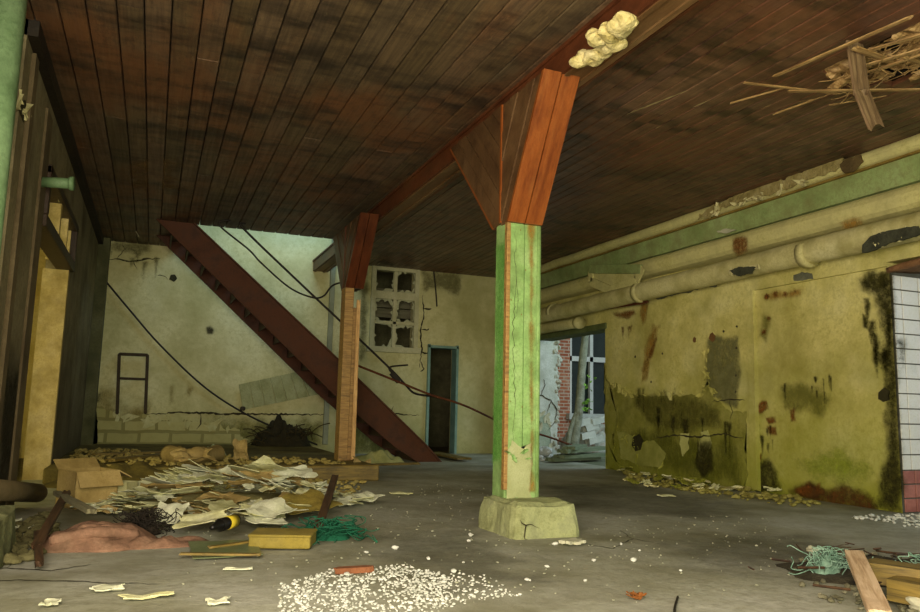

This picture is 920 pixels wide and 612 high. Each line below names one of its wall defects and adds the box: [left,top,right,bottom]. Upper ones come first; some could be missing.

rust [733,237,747,255]
crack [419,296,432,372]
crack [539,379,558,444]
flaking render [604,332,748,487]
leakage [636,389,737,481]
crack [655,399,743,462]
leakage [782,376,831,414]
leakage [792,272,905,512]